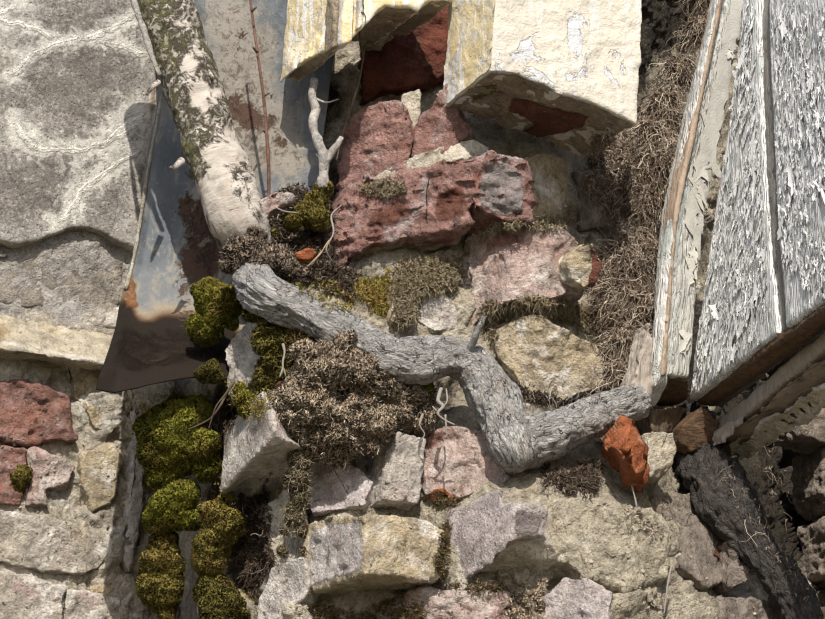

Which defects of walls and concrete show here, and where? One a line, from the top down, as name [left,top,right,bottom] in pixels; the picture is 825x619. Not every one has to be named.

crack [0,4,148,77]
crack [15,112,146,223]
corrosion [124,261,138,308]
corrosion [179,191,219,276]
peeling [679,0,771,391]
peeling [770,0,825,308]